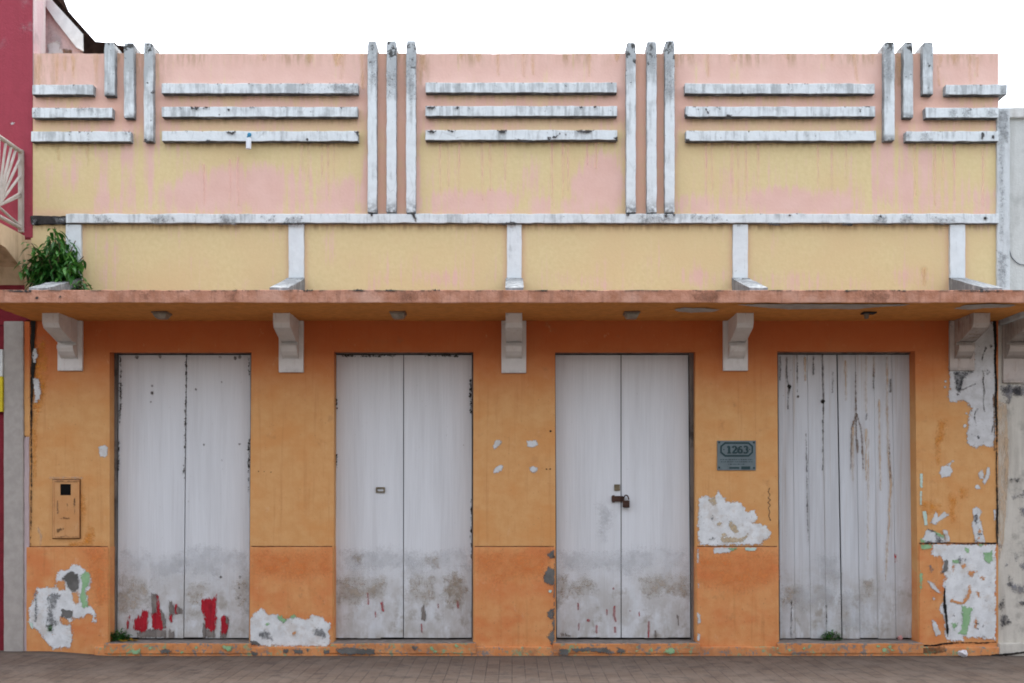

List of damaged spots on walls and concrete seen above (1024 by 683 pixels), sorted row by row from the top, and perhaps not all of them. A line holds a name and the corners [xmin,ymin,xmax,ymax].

peeling [944,322,996,449]
peeling [939,460,954,478]
peeling [975,467,990,490]
leakage [998,385,1024,548]
peeling [28,562,97,650]
peeling [250,608,375,656]
spalling [544,550,675,656]
peeling [696,491,771,563]
peeling [919,473,996,642]
leakage [998,564,1024,627]